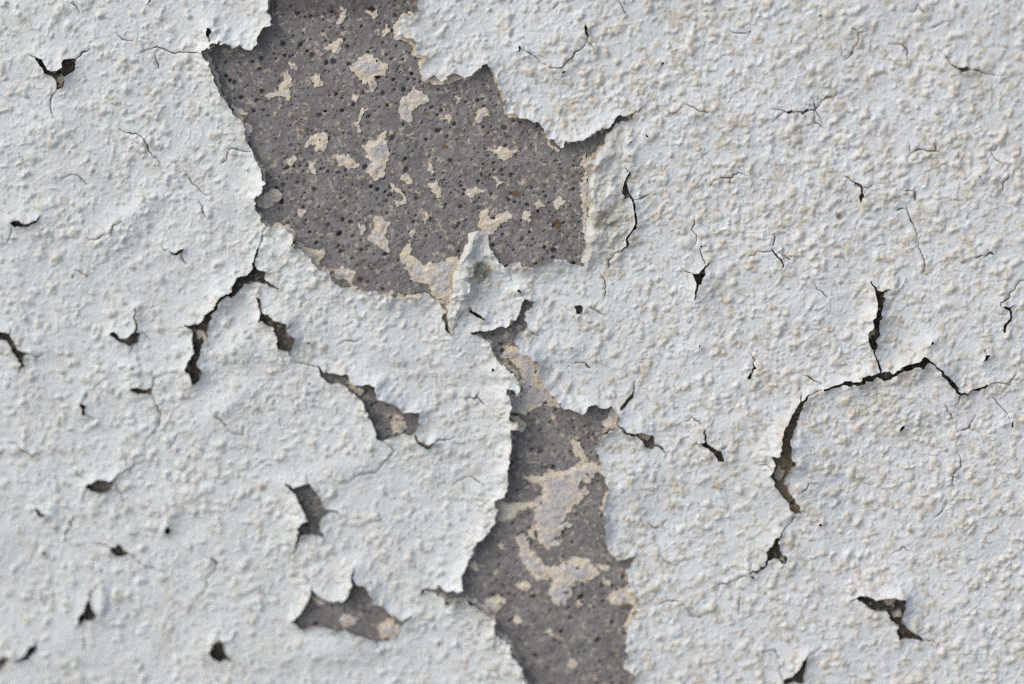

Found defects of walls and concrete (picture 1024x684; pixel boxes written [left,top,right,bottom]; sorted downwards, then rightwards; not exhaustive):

peeling [144,0,642,336]
crack [600,168,648,300]
crack [684,217,710,300]
crack [0,330,44,373]
crack [109,309,149,351]
peeling [420,289,639,684]
crack [623,382,666,453]
crack [657,281,1016,618]